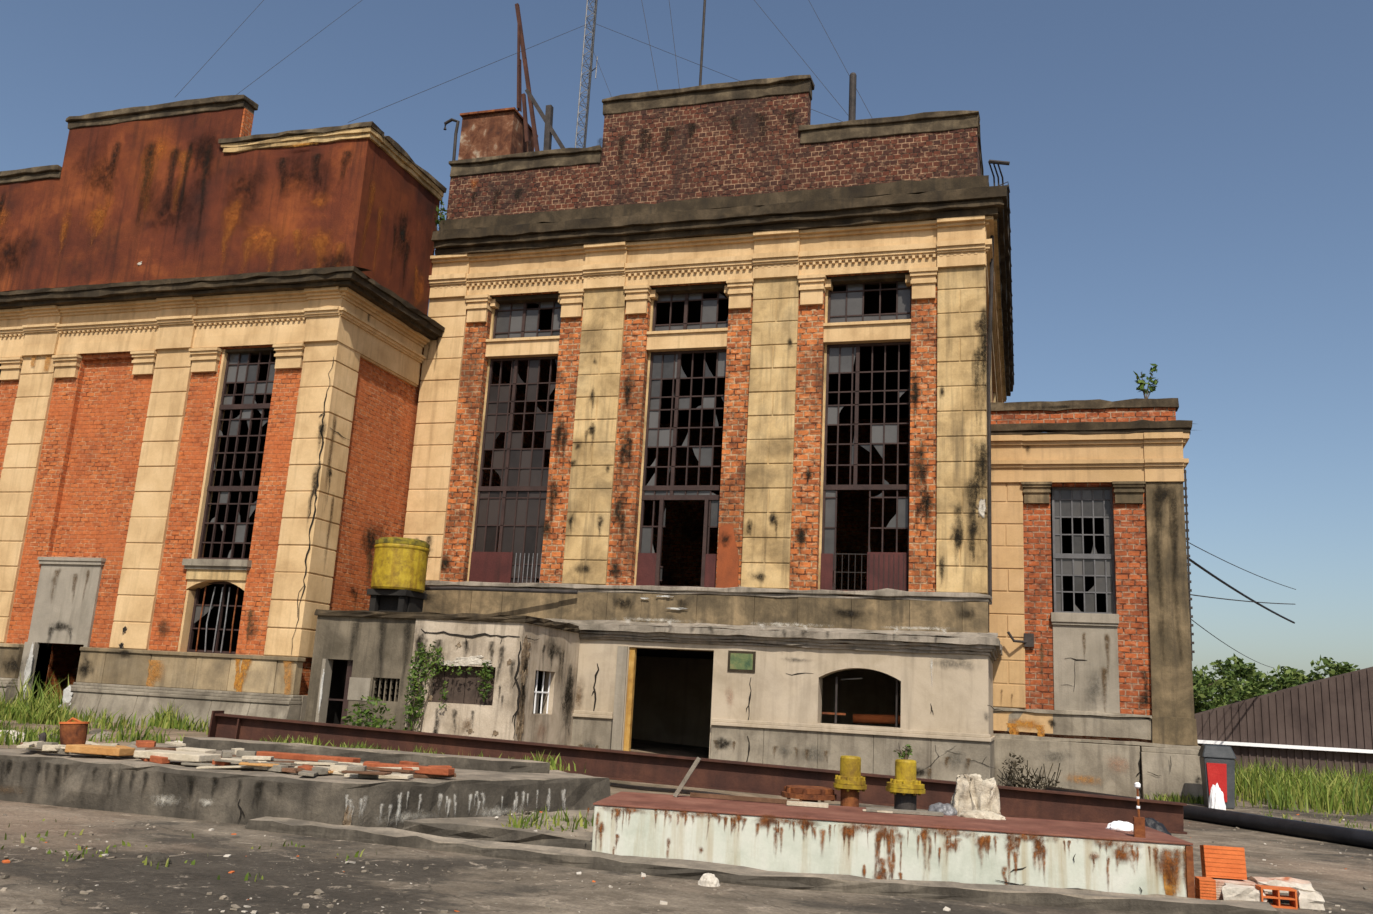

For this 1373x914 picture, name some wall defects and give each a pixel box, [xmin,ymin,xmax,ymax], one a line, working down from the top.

water stain [975,309,992,392]
crack [291,357,349,654]
water stain [951,445,988,550]
water stain [1154,488,1177,598]
water stain [346,792,421,819]
water stain [439,789,566,815]